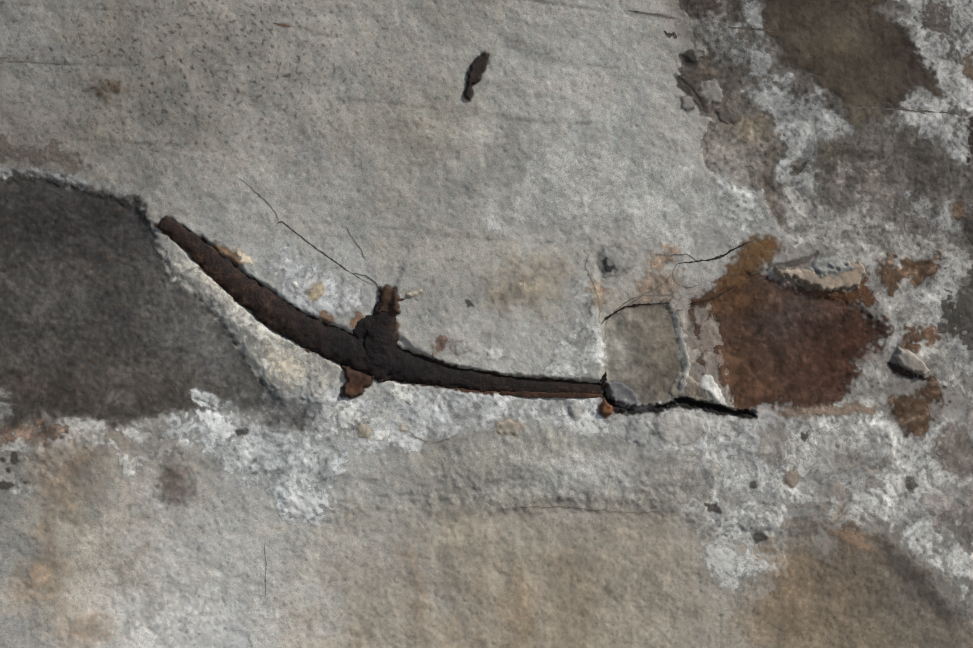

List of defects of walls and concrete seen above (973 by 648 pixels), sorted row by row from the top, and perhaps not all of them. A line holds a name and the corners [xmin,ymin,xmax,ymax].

peeling [676,0,973,293]
damp [0,234,622,526]
corrosion [155,216,610,399]
corrosion [635,244,680,311]
crack [585,240,754,323]
crack [597,372,758,419]
damp [646,0,973,599]
corrosion [689,234,951,438]
peeling [887,347,930,380]
spalling [705,502,722,513]
spalling [753,532,768,543]
flaking render [783,467,800,488]